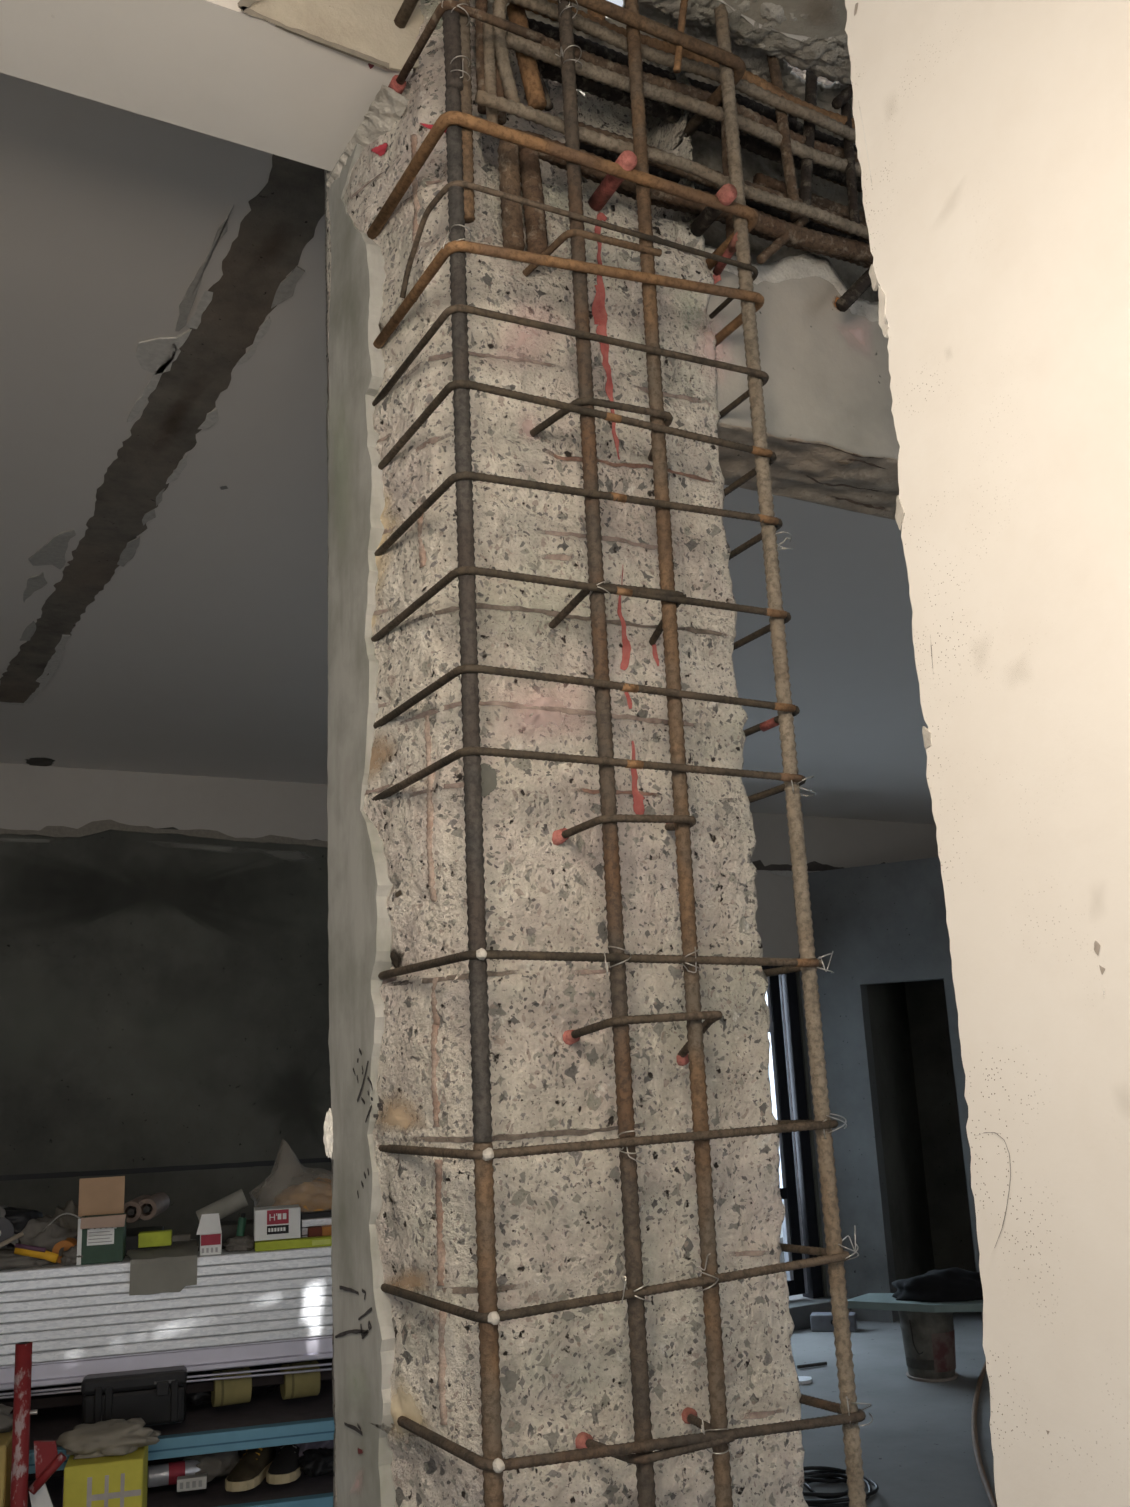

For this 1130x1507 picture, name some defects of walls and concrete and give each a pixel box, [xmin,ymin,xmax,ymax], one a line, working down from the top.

spalling [487,0,644,61]
spalling [605,0,858,145]
flaking render [869,264,889,338]
peeling [0,0,424,705]
rust [609,492,627,503]
flaking render [895,495,905,530]
rust [620,683,639,693]
flaking render [922,726,932,749]
flaking render [481,763,497,797]
rust [625,759,644,769]
rust [391,1388,422,1431]